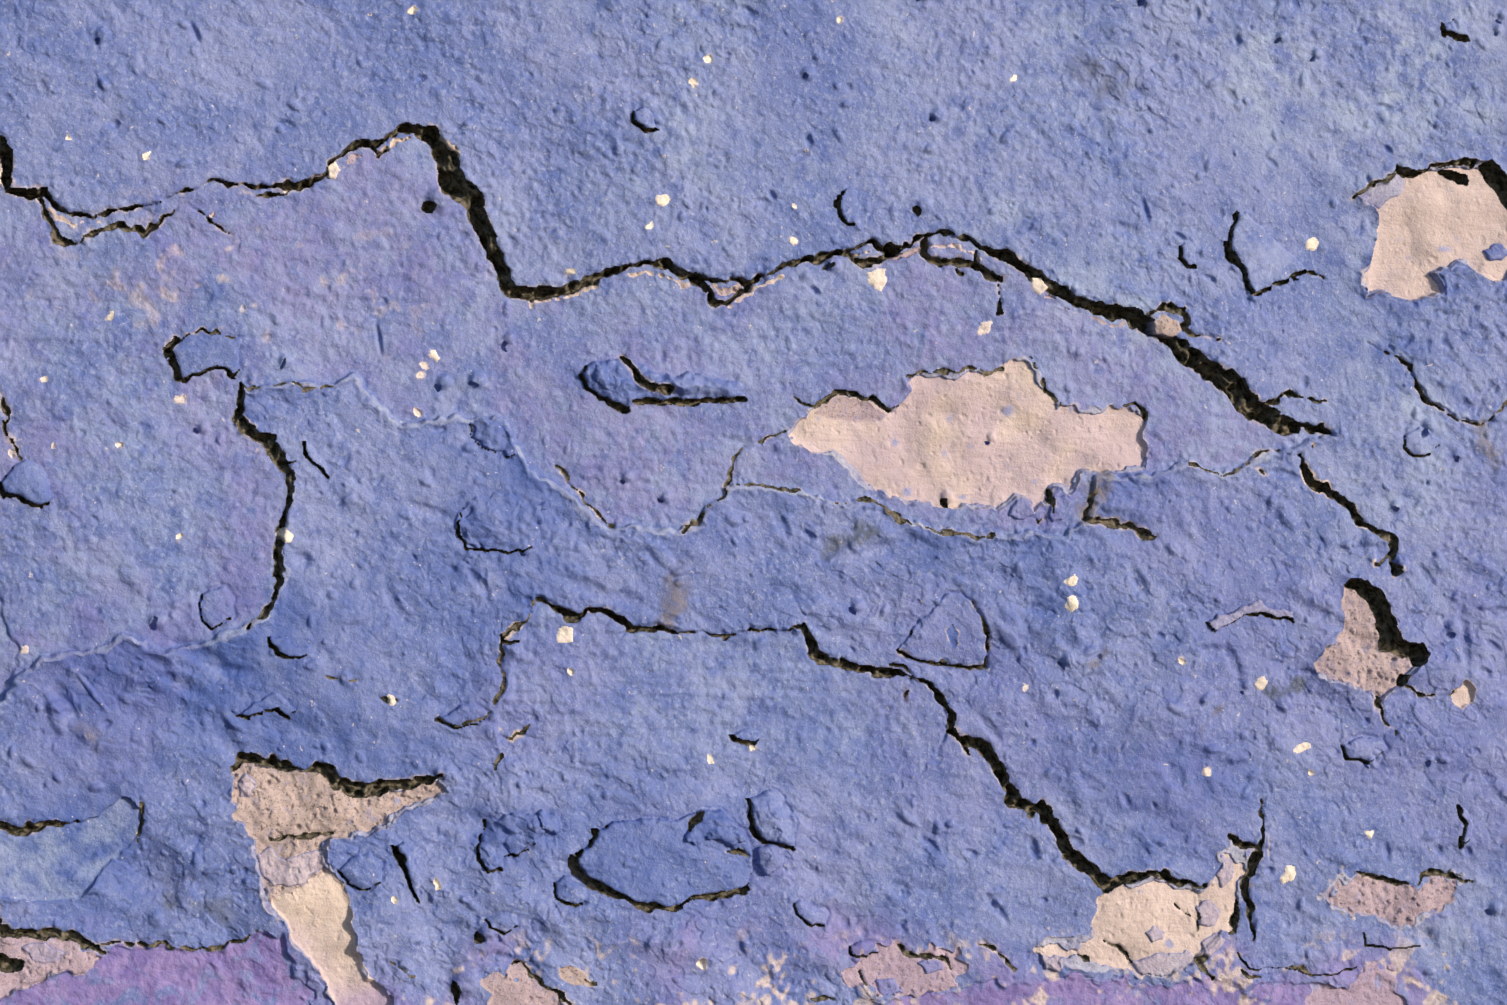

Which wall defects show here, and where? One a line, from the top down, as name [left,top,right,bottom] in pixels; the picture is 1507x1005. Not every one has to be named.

crack [232,381,334,630]
peeling [0,133,1344,706]
crack [0,122,1404,570]
spalling [1352,157,1507,424]
crack [1383,351,1507,426]
spalling [1314,568,1431,700]
spalling [0,937,102,1000]
spalling [230,752,449,1005]
crack [511,961,597,1005]
crack [810,970,868,1002]
crack [434,597,1313,981]
spalling [1033,840,1469,1005]